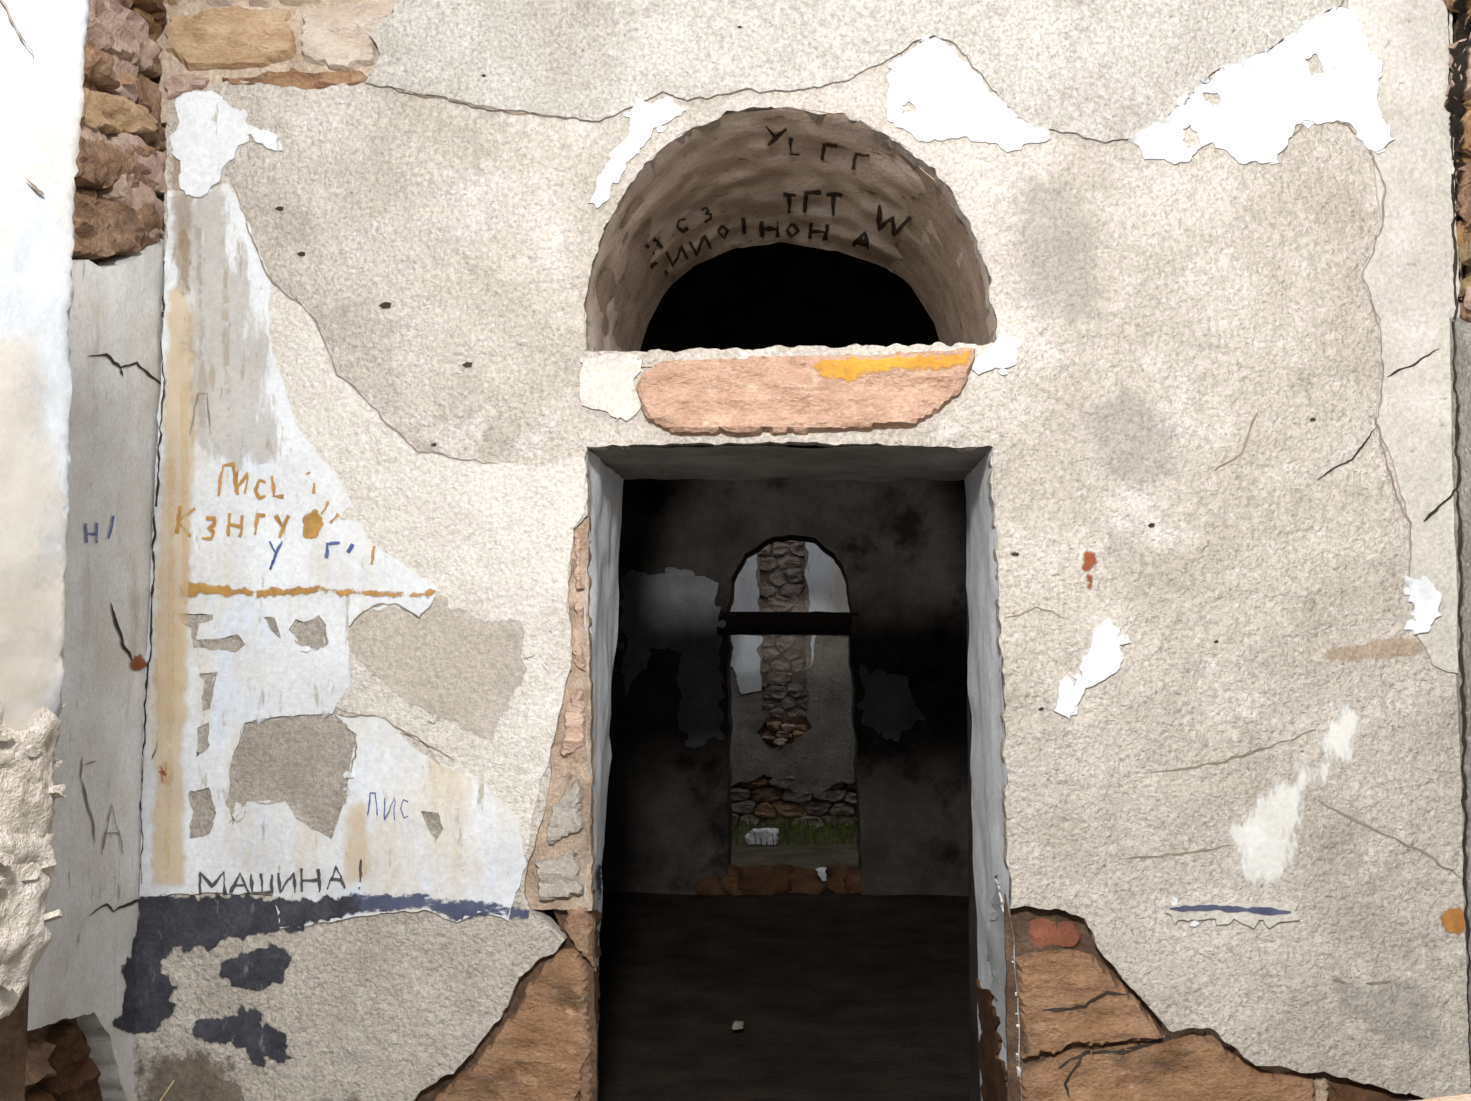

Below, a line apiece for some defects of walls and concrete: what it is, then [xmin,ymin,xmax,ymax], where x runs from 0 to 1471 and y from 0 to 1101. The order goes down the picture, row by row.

flaking render [72,0,395,261]
peeling [886,35,1050,153]
peeling [1127,6,1396,165]
crack [89,243,167,916]
crack [1214,409,1259,471]
crack [1281,9,1471,1087]
flaking render [112,516,603,1101]
peeling [1165,705,1359,928]
flaking render [24,1017,103,1101]
crack [1042,991,1126,1012]
crack [1059,1038,1160,1097]
flaking render [976,875,1423,1101]